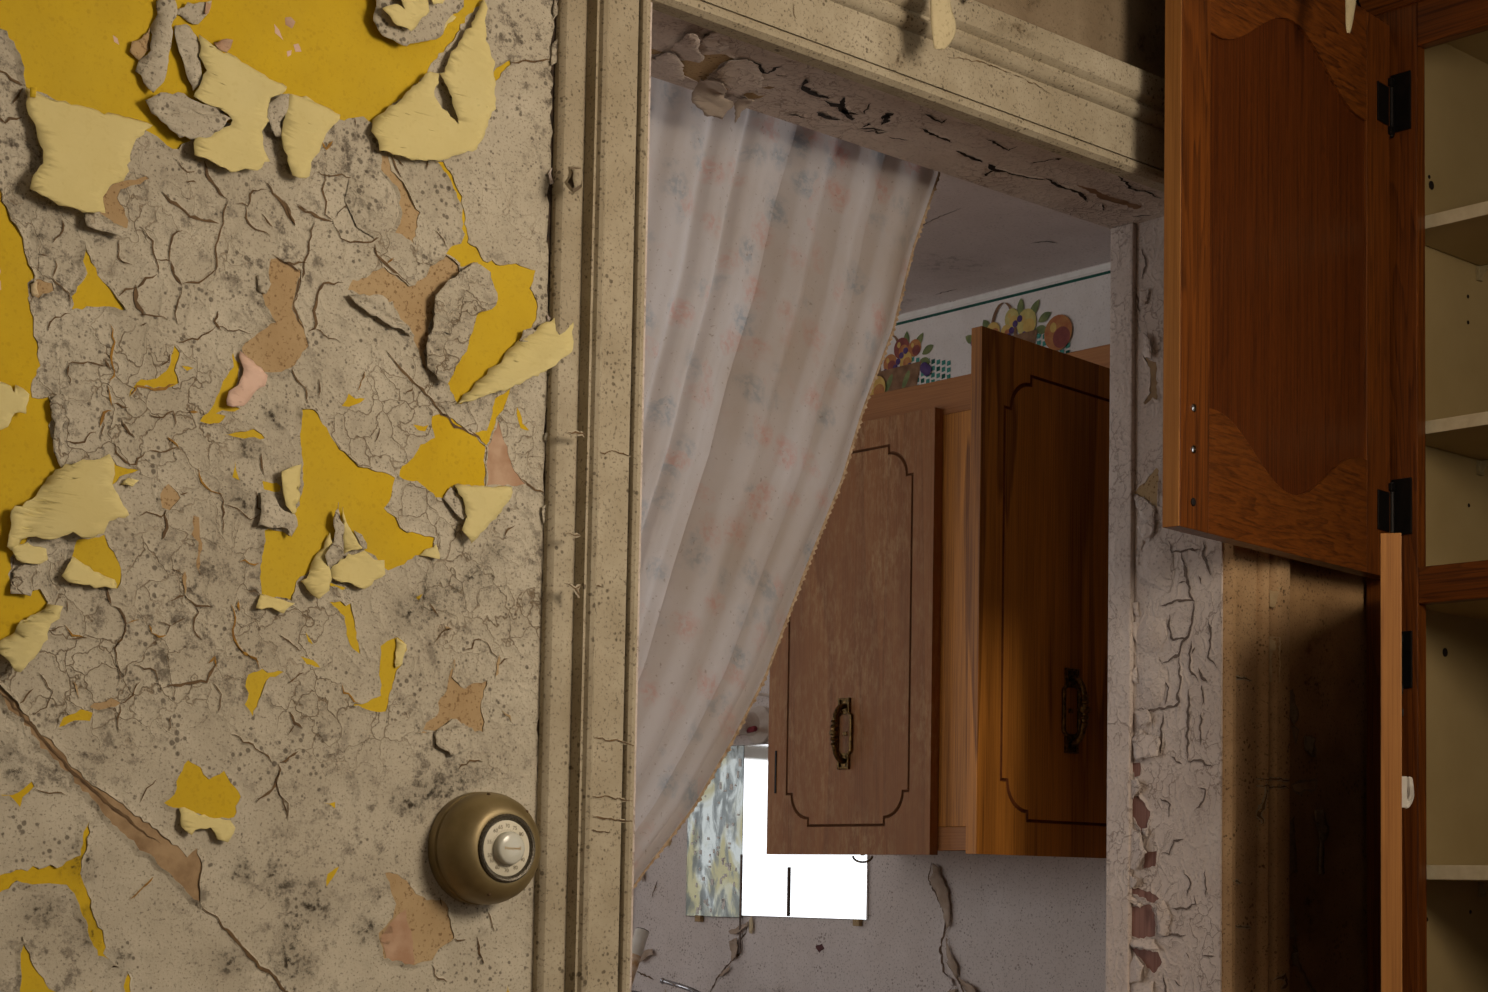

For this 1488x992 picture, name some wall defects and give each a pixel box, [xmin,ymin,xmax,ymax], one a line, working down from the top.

crack [0,69,23,125]
peeling [651,32,779,123]
crack [752,56,1162,315]
crack [48,120,486,821]
peeling [0,0,583,721]
peeling [0,814,133,992]
crack [0,672,290,992]
peeling [159,756,245,842]
peeling [374,867,455,969]
crack [925,860,976,992]
peeling [1129,709,1171,992]
crack [1135,540,1252,992]